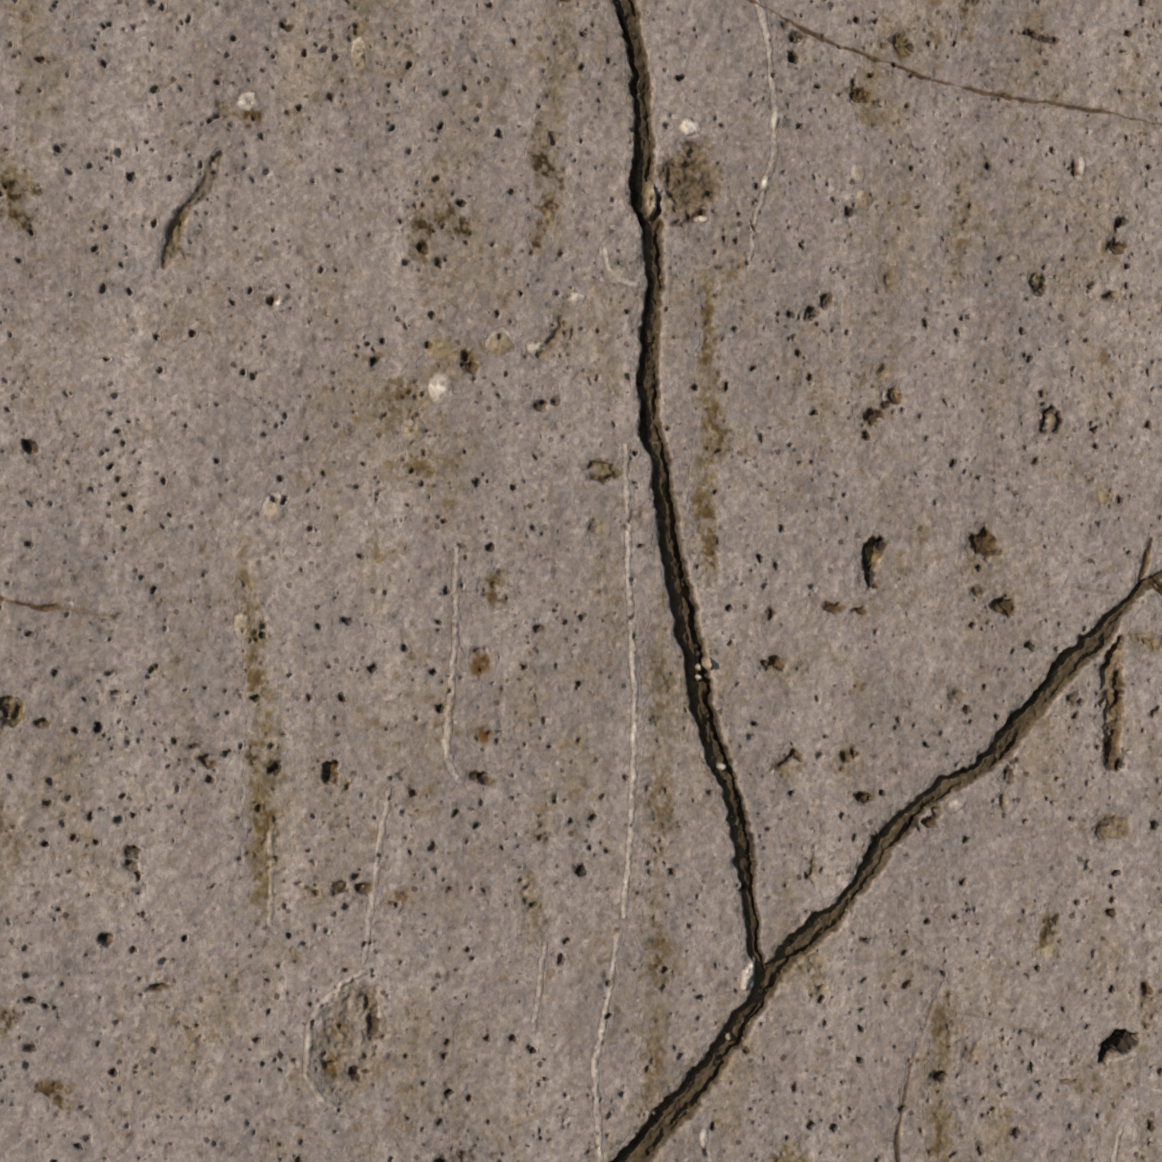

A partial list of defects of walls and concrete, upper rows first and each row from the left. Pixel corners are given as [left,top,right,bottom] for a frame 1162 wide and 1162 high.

crack [0,591,114,621]
crack [609,0,1162,1162]